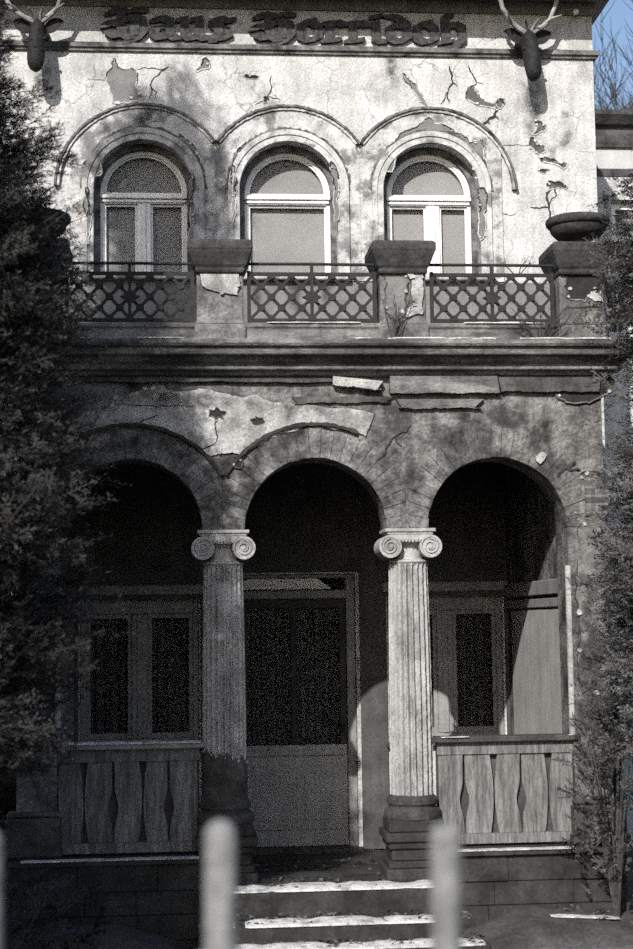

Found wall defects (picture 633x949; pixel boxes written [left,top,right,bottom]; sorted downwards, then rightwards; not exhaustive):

spalling [105,58,146,105]
crack [138,66,169,98]
spalling [394,72,486,160]
crack [441,66,482,104]
spalling [465,85,506,111]
spalling [529,119,568,191]
peeling [472,167,488,241]
spalling [383,274,424,320]
spalling [564,275,604,303]
crack [114,404,194,422]
peeling [92,385,374,469]
spalling [554,376,616,405]